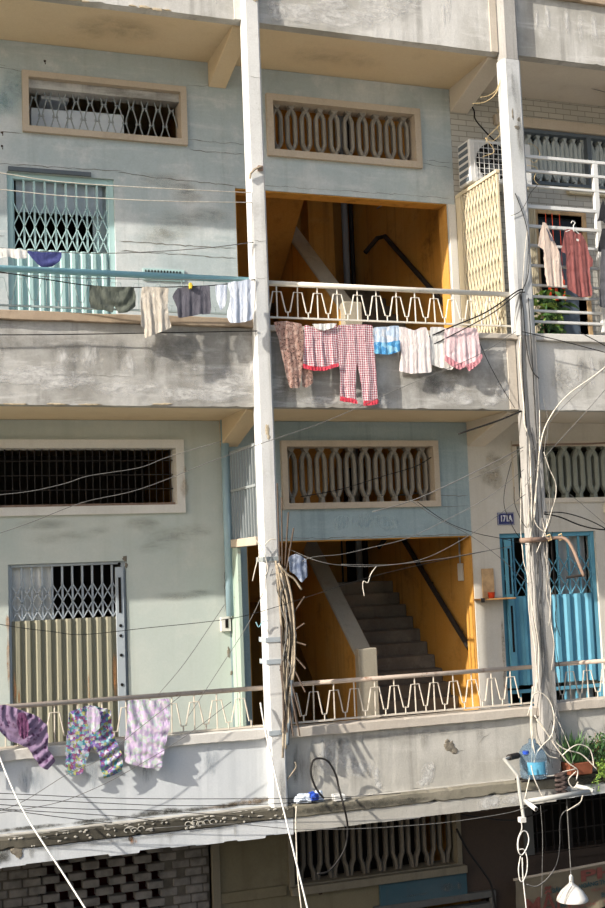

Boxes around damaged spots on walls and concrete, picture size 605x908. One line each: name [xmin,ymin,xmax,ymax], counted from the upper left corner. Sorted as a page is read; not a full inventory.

water stain [0,344,95,387]
water stain [165,364,254,400]
spalling [444,739,458,754]
peeling [104,807,289,841]
spalling [8,829,92,859]